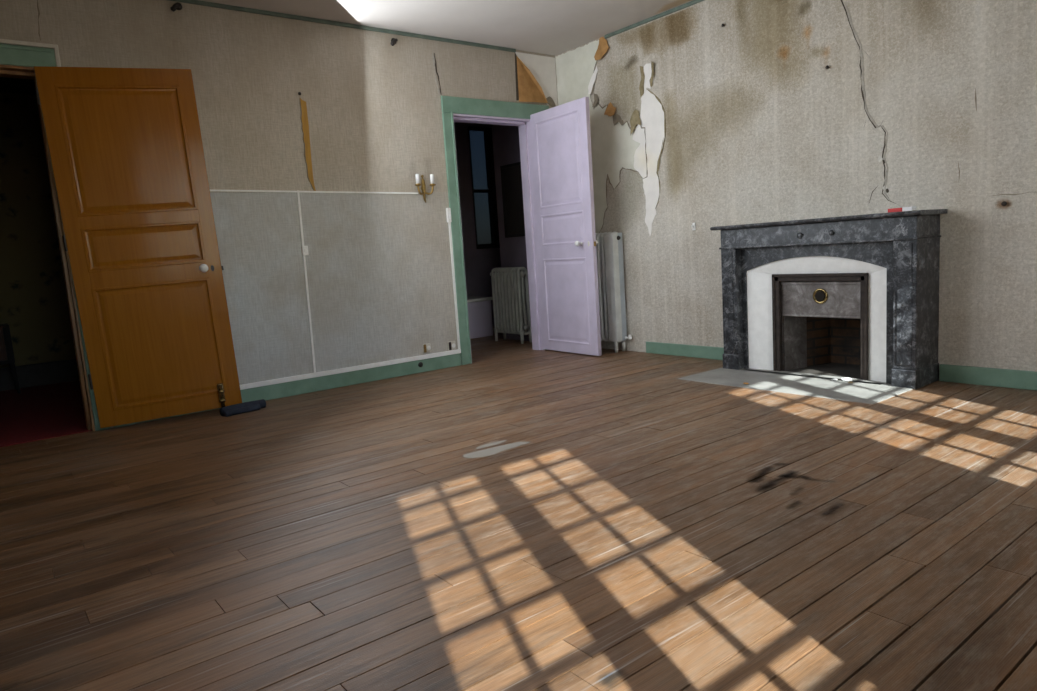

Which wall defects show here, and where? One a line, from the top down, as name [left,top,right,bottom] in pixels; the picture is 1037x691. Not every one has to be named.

flaking render [515,40,643,233]
crack [841,0,896,204]